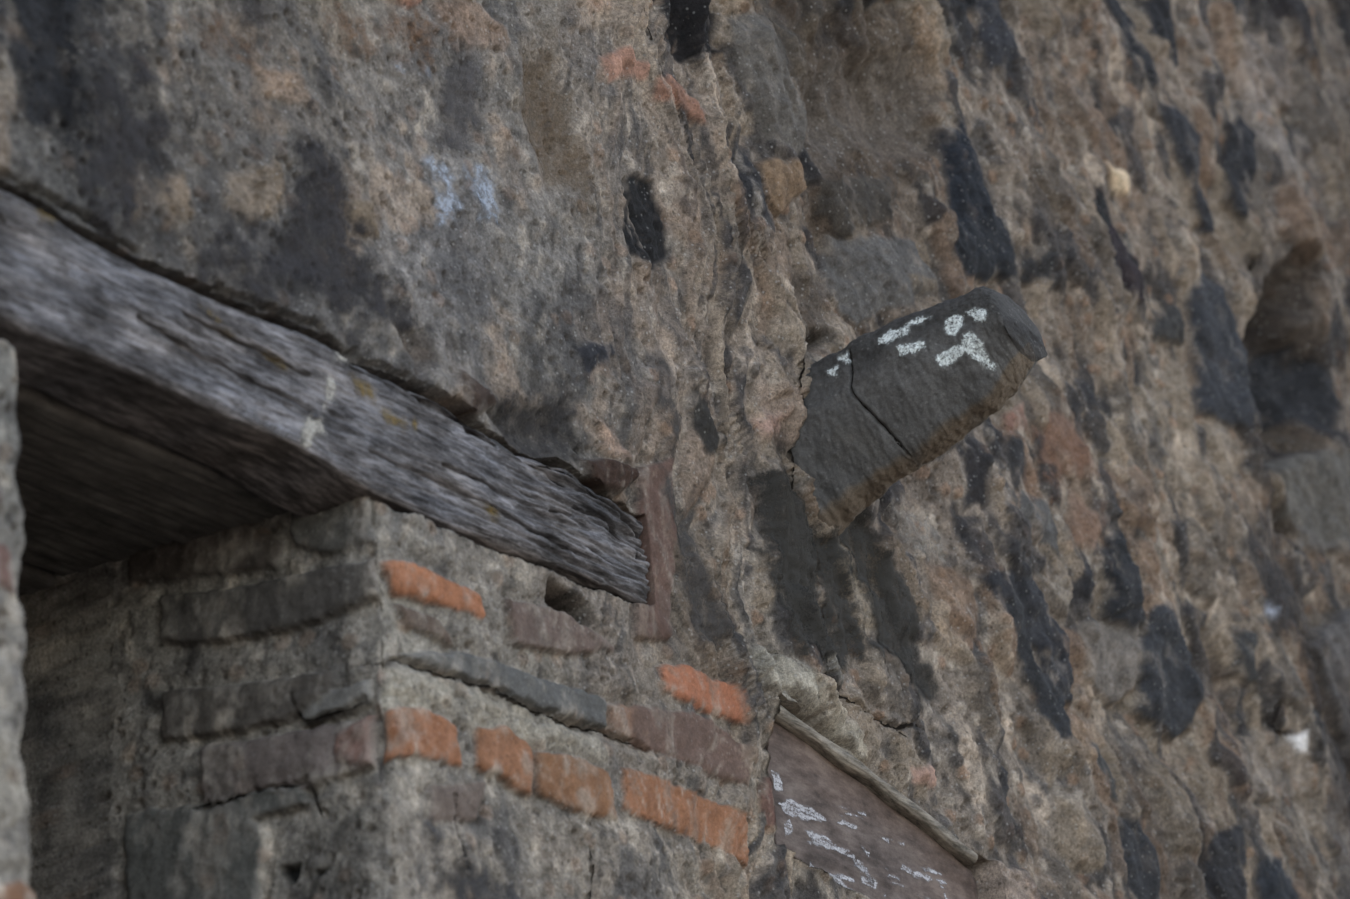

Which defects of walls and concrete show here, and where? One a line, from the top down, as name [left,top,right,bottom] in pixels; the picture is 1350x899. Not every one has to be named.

crack [850,351,904,450]